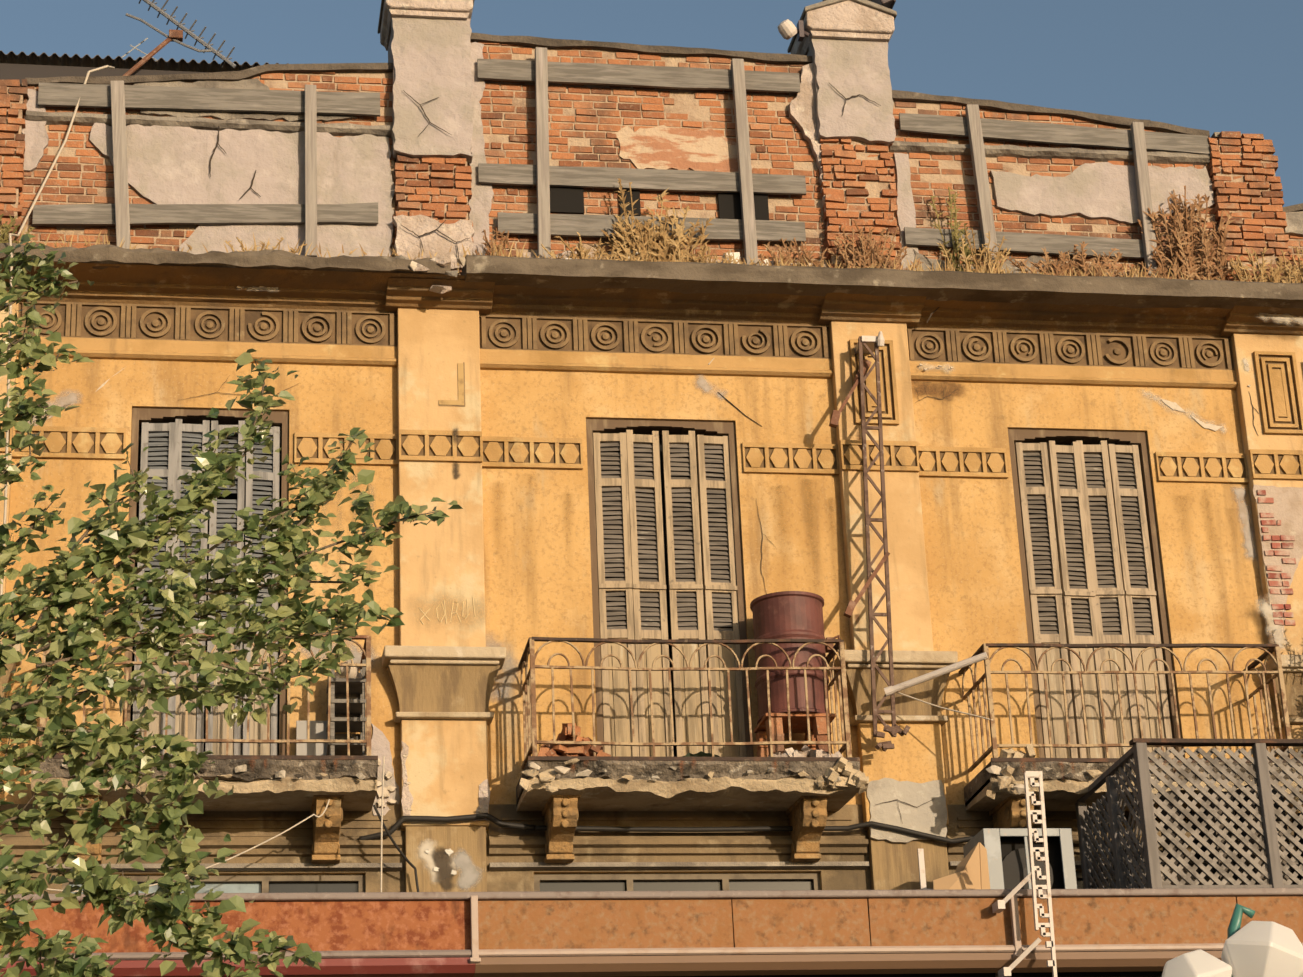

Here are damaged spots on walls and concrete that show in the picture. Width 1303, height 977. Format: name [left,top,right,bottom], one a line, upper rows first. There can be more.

crack [209,126,226,177]
crack [240,170,261,199]
peeling [1153,397,1225,431]
flaking render [1235,484,1303,648]
flaking render [866,778,947,844]